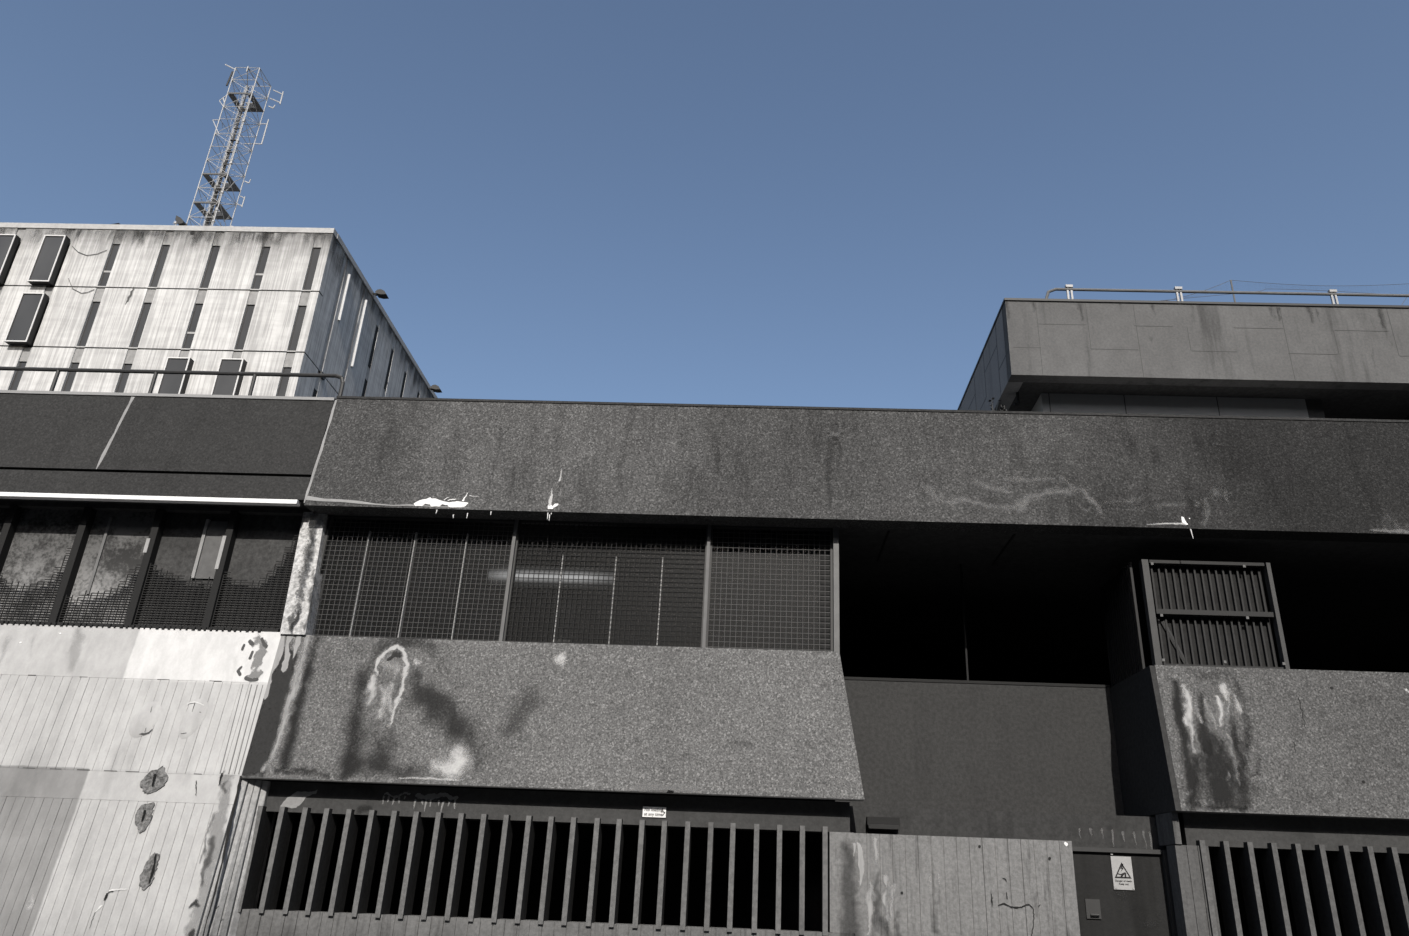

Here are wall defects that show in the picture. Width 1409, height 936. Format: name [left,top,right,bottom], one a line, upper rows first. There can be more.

peeling [237,511,317,700]
spalling [135,766,168,833]
damp [1173,681,1250,810]
spalling [139,852,160,891]